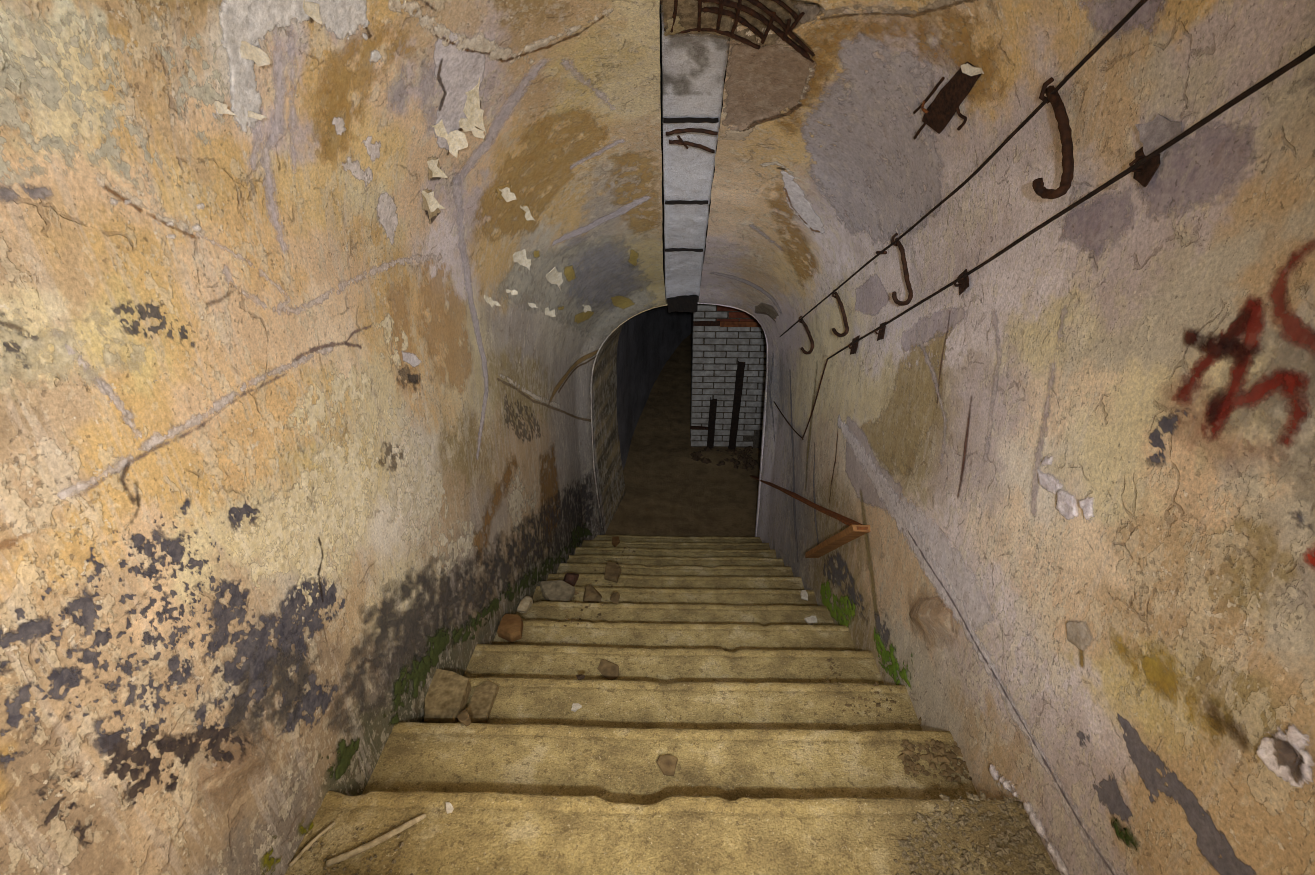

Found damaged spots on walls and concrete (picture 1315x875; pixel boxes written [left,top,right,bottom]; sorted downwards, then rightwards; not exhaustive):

crack [0,185,51,202]
leakage [113,301,195,347]
peeling [154,0,382,144]
crack [97,176,441,315]
peeling [421,31,487,224]
leakage [453,59,656,459]
crack [0,322,371,516]
leakage [0,443,594,805]
crack [316,538,324,601]
leakage [38,773,94,845]
flaking render [1116,713,1256,875]
spalling [1256,726,1312,787]